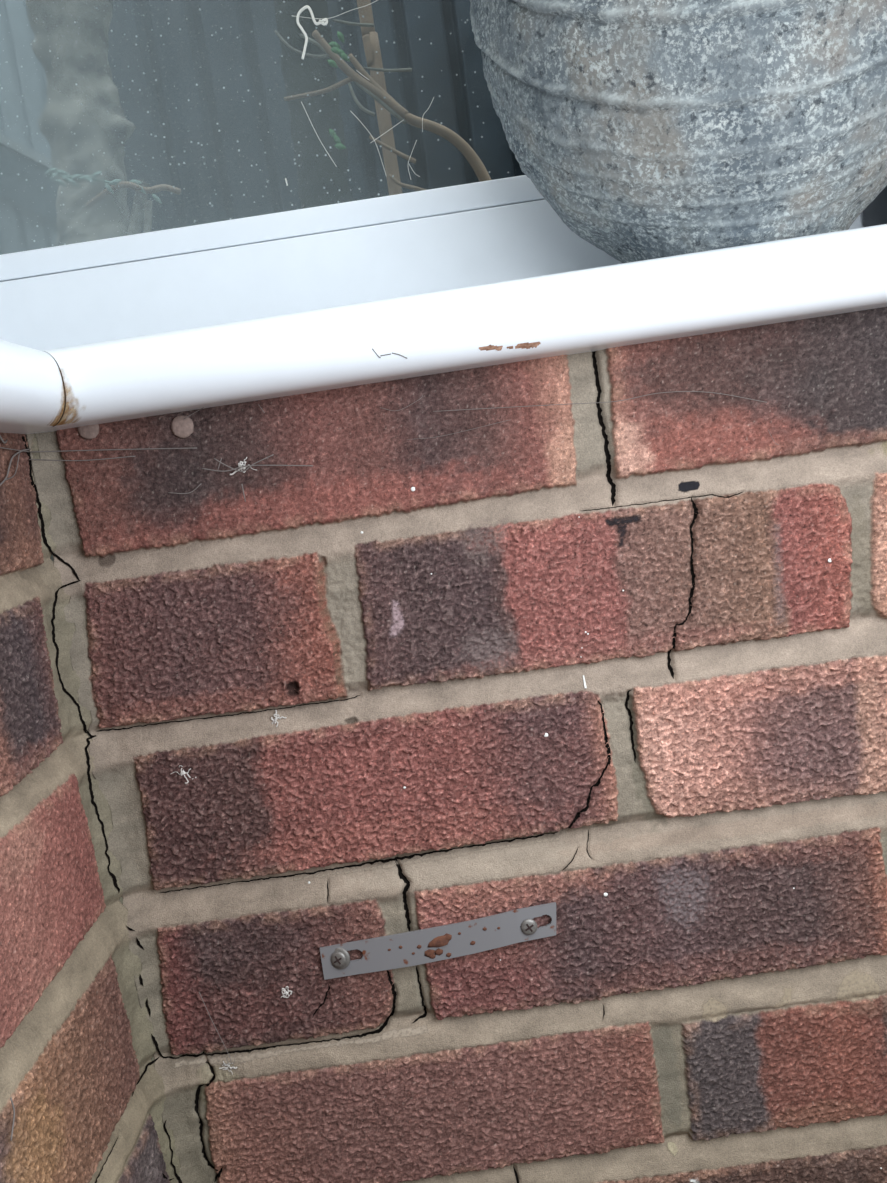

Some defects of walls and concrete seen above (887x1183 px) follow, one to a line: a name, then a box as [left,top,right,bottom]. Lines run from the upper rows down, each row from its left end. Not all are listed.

crack [583,351,742,679]
crack [22,436,360,892]
crack [159,690,636,932]
crack [127,926,427,1183]
rust [388,932,475,959]